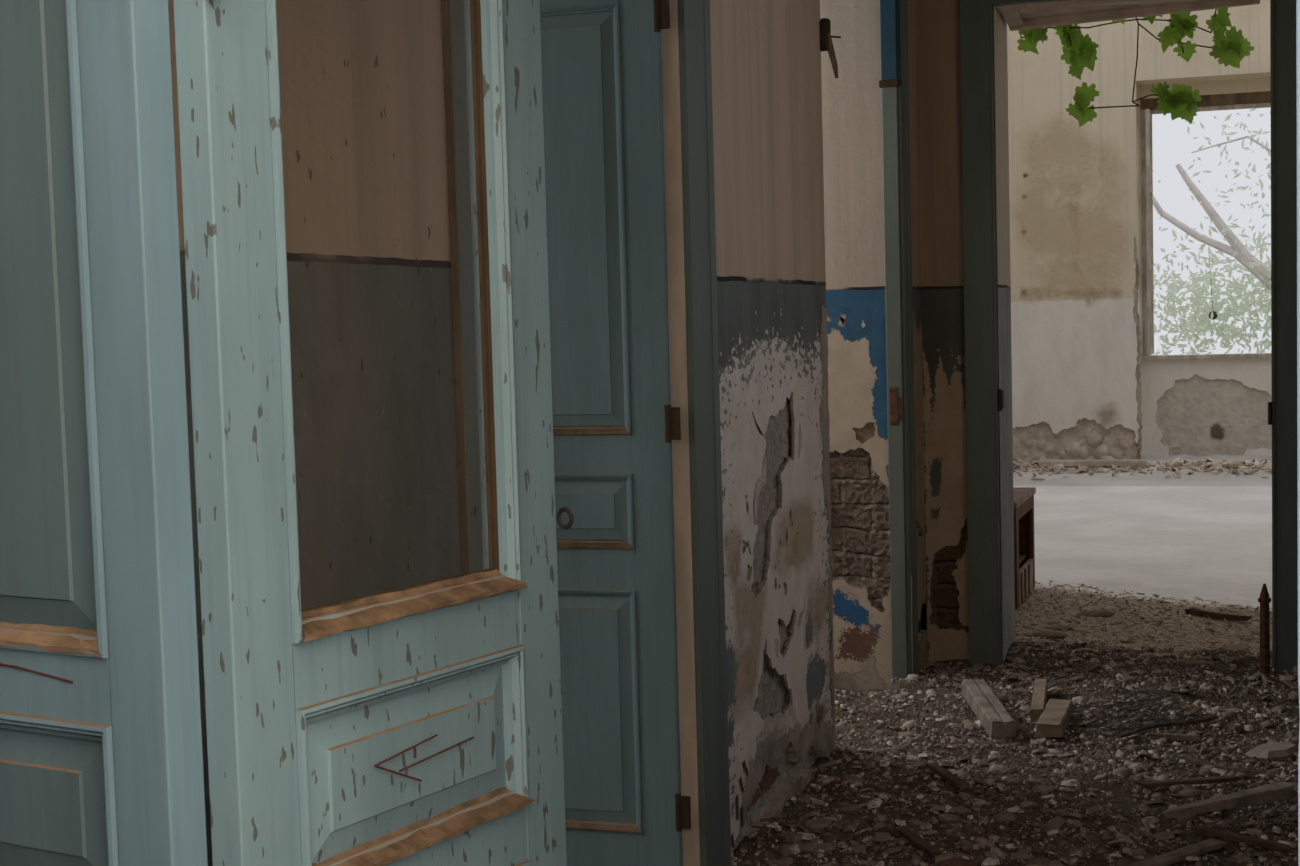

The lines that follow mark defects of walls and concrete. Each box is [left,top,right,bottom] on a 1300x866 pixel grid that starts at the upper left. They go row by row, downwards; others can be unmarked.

peeling [719,304,892,858]
peeling [913,313,969,671]
spalling [1012,418,1141,462]
spalling [1155,374,1272,457]